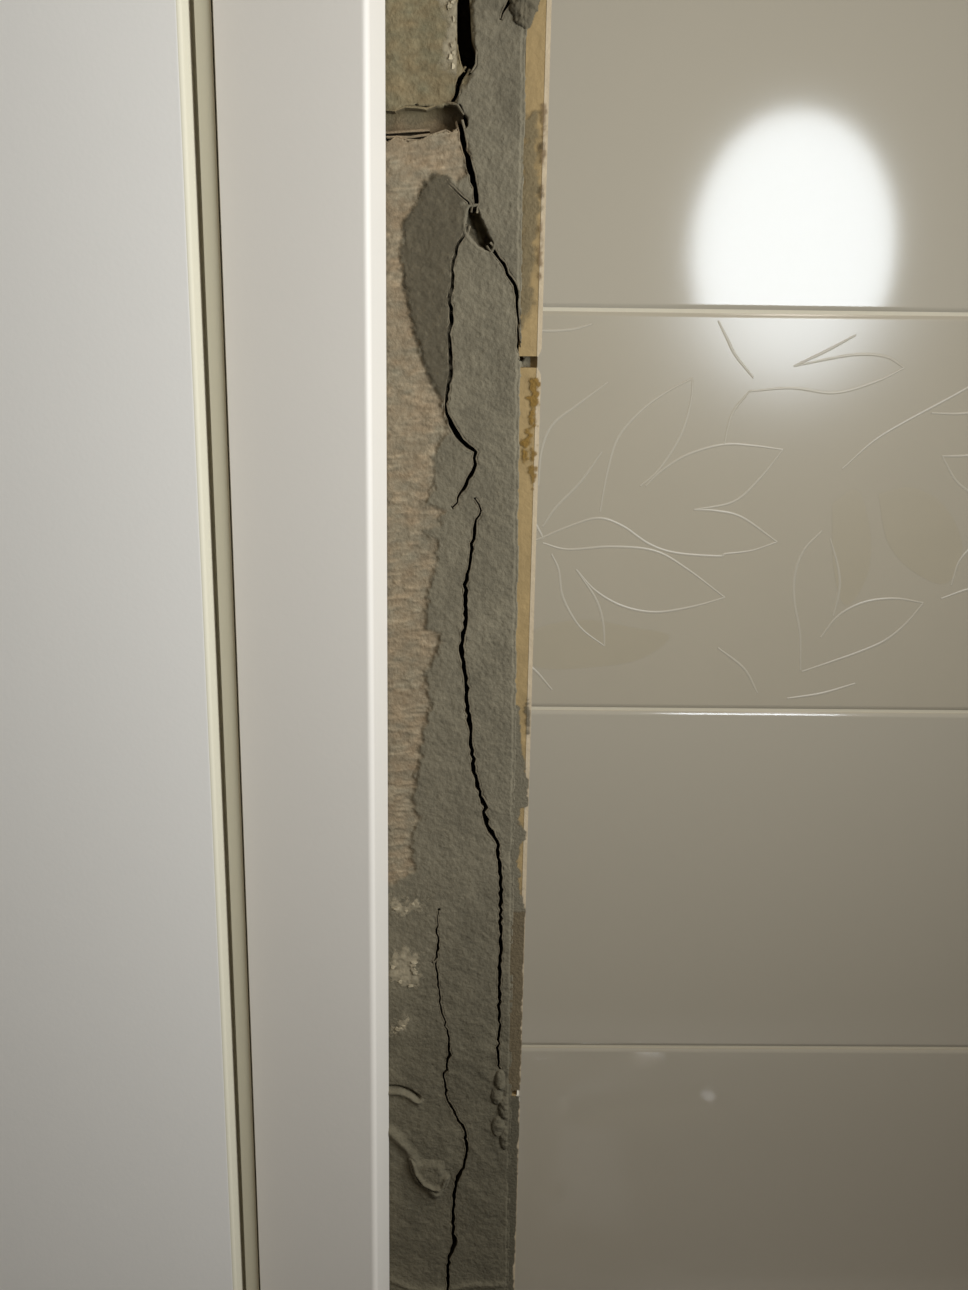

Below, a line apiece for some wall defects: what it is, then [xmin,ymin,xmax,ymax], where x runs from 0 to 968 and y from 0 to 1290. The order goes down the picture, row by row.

crack [499,0,510,20]
spalling [440,0,457,73]
spalling [463,204,496,254]
crack [443,66,525,1070]
peeling [388,894,423,916]
peeling [388,945,422,988]
crack [431,909,470,1290]